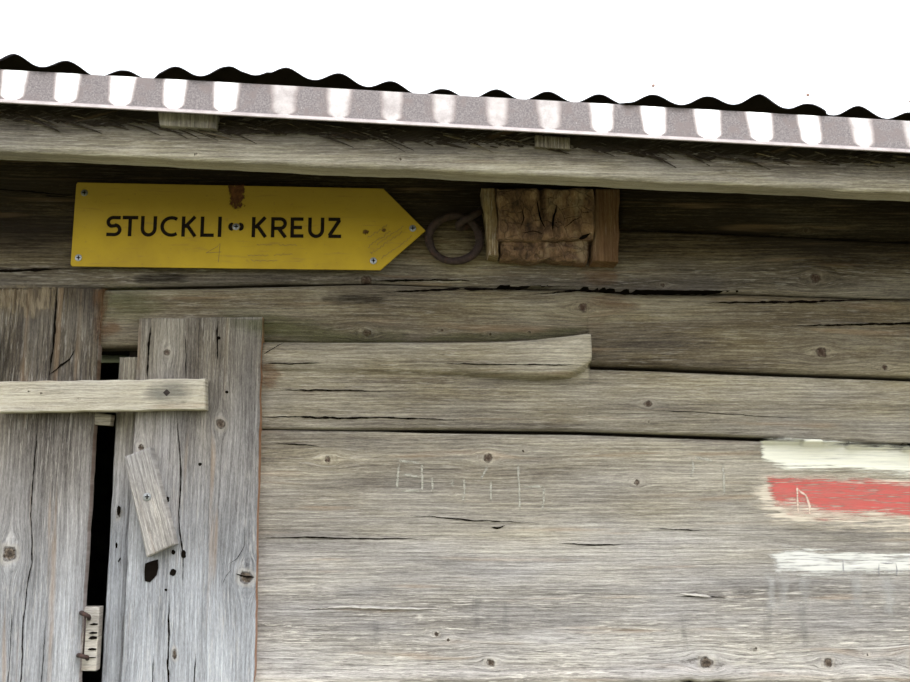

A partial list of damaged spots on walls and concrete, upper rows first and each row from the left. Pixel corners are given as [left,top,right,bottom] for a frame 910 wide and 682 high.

crack [379,279,910,326]